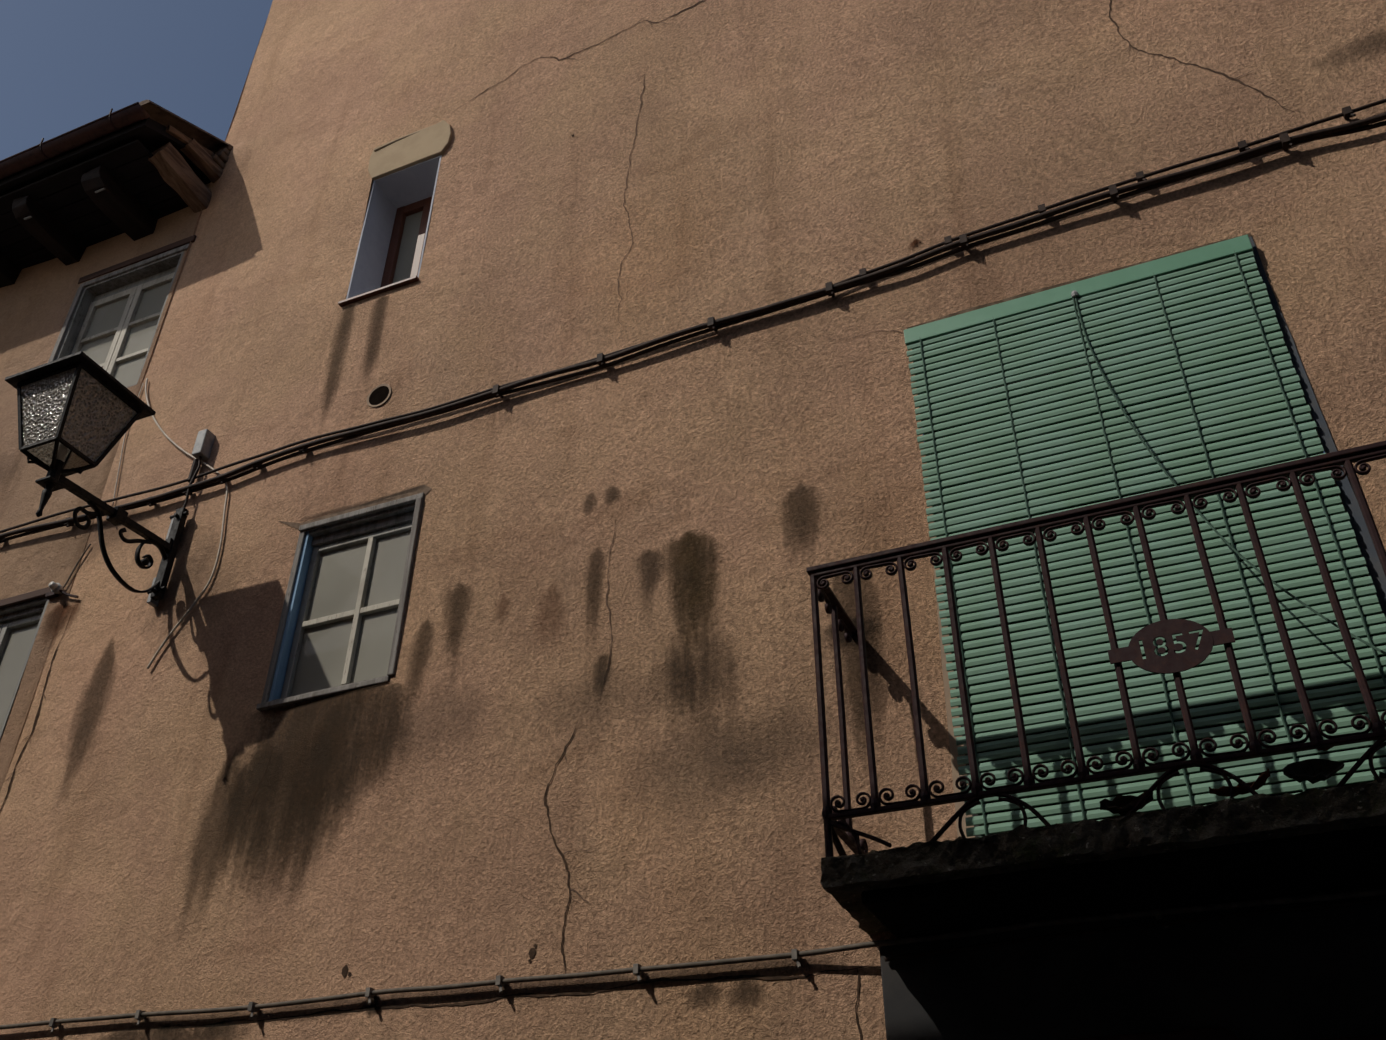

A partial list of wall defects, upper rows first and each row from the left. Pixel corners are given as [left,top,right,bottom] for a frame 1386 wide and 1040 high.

crack [449,0,705,117]
crack [1109,0,1311,113]
crack [618,63,650,335]
leakage [326,307,353,402]
leakage [368,296,386,365]
leakage [788,485,814,539]
leakage [412,621,430,681]
leakage [450,584,466,643]
leakage [642,550,657,589]
leakage [191,685,400,887]
crack [147,522,870,1040]